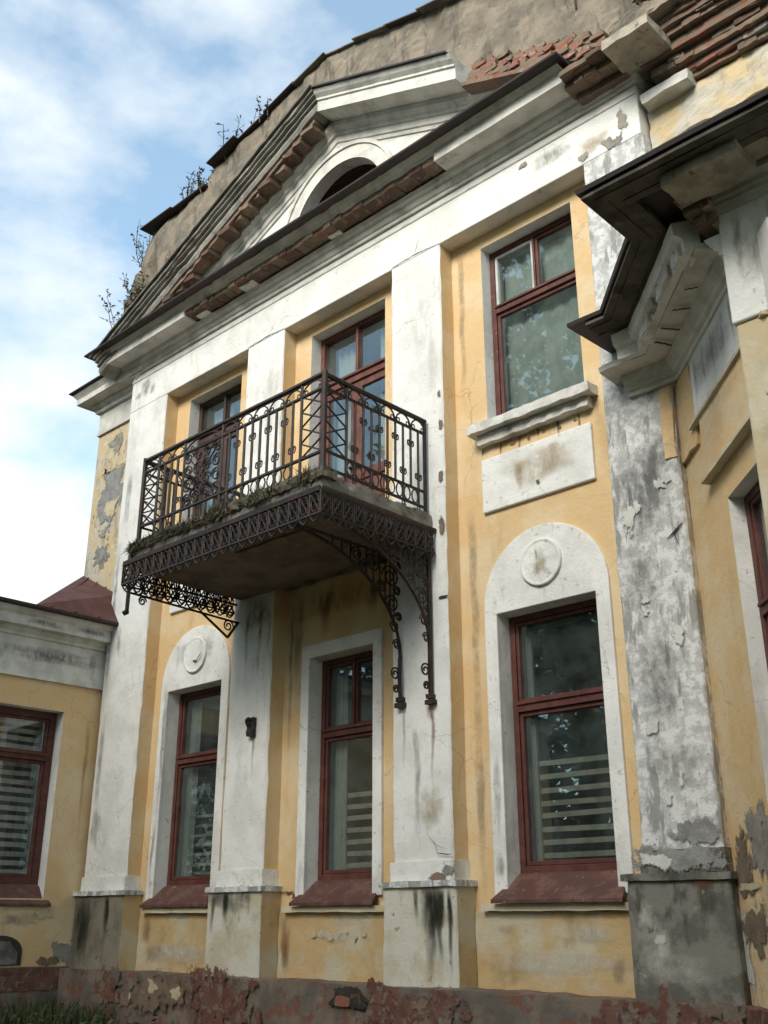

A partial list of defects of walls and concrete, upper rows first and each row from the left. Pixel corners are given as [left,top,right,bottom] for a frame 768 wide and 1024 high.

peeling [578,109,628,162]
peeling [93,432,127,569]
peeling [622,473,671,537]
water stain [76,898,108,948]
water stain [212,893,229,915]
water stain [414,890,452,949]
spalling [580,795,768,1024]
peeling [94,957,262,1024]
peeling [325,977,472,1024]